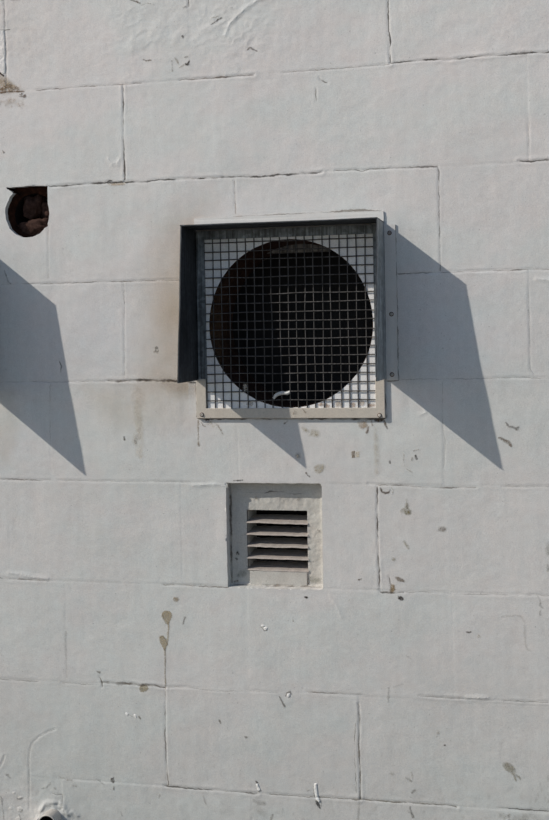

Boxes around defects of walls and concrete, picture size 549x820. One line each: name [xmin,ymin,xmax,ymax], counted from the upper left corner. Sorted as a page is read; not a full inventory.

peeling [0,29,26,97]
damp [159,611,172,663]